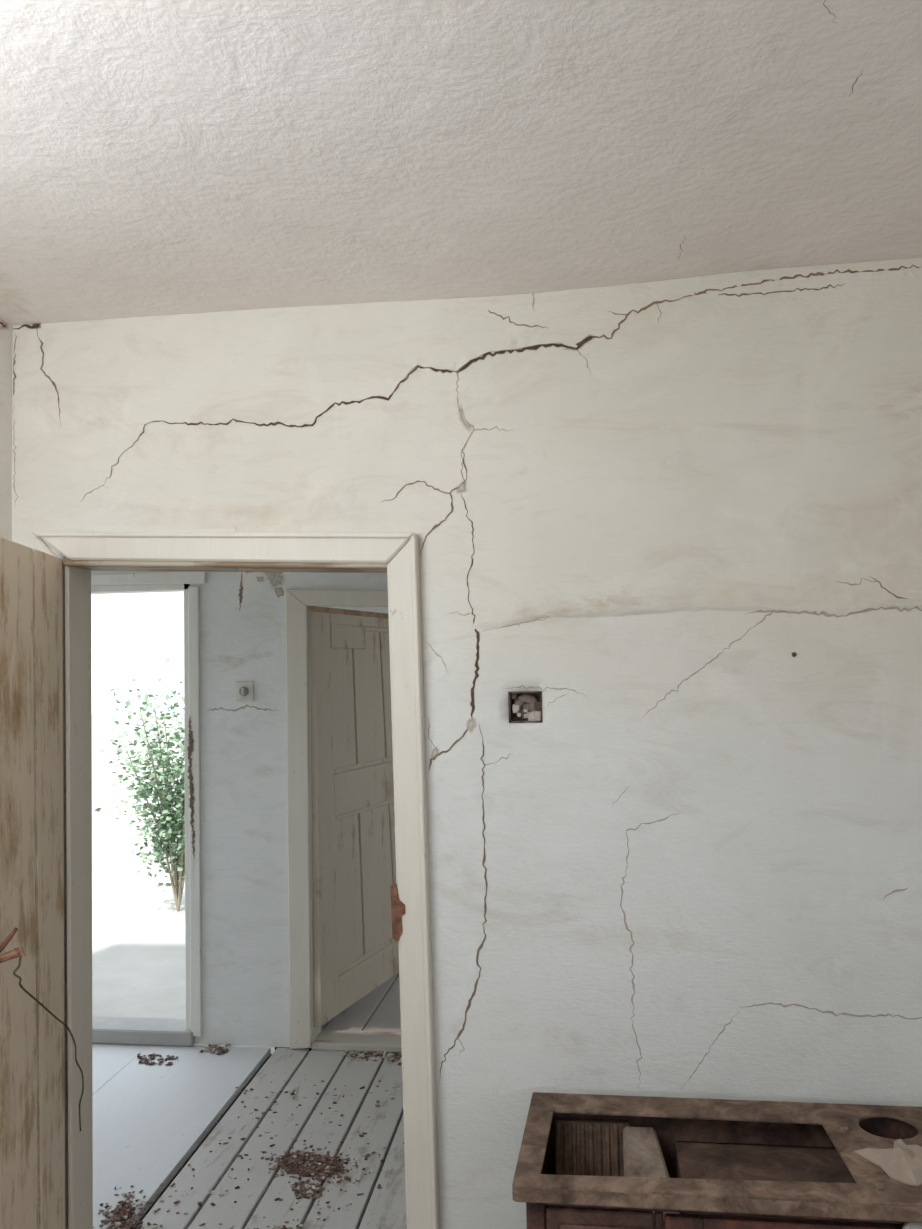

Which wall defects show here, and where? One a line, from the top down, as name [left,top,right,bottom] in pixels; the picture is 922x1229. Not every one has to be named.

crack [0,322,60,501]
crack [83,265,922,1086]
crack [683,1003,922,1087]